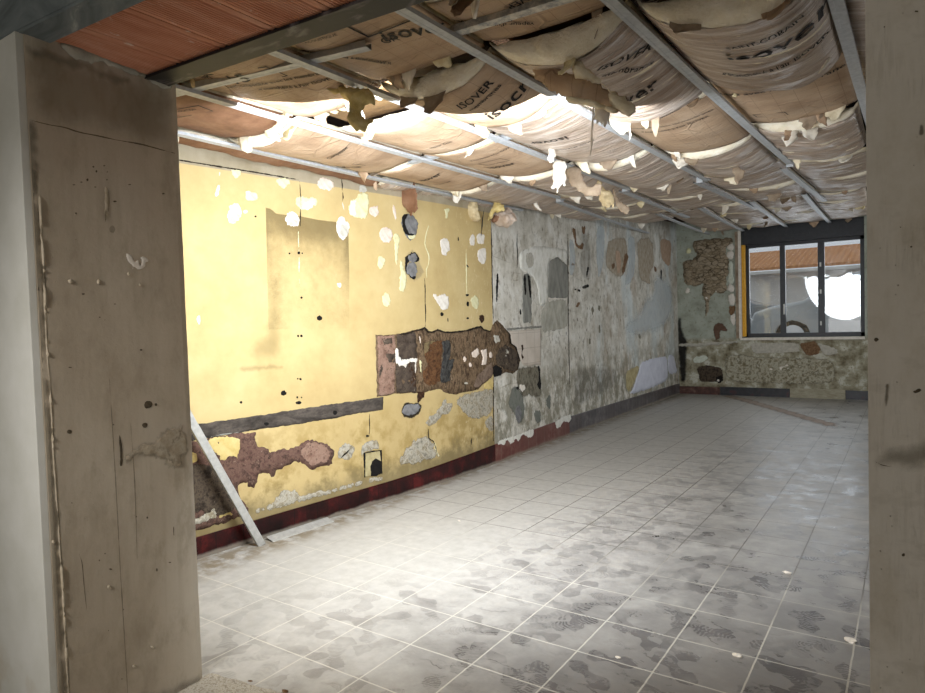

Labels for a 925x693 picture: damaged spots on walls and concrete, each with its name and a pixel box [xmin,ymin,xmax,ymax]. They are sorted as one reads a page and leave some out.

peeling [285,196,317,227]
peeling [336,185,379,240]
peeling [379,227,393,243]
peeling [440,233,486,264]
spalling [520,257,580,333]
spalling [606,238,671,284]
spalling [682,238,734,316]
spalling [800,341,820,356]
spalling [375,294,524,465]
peeling [498,429,534,445]
spalling [119,425,383,530]